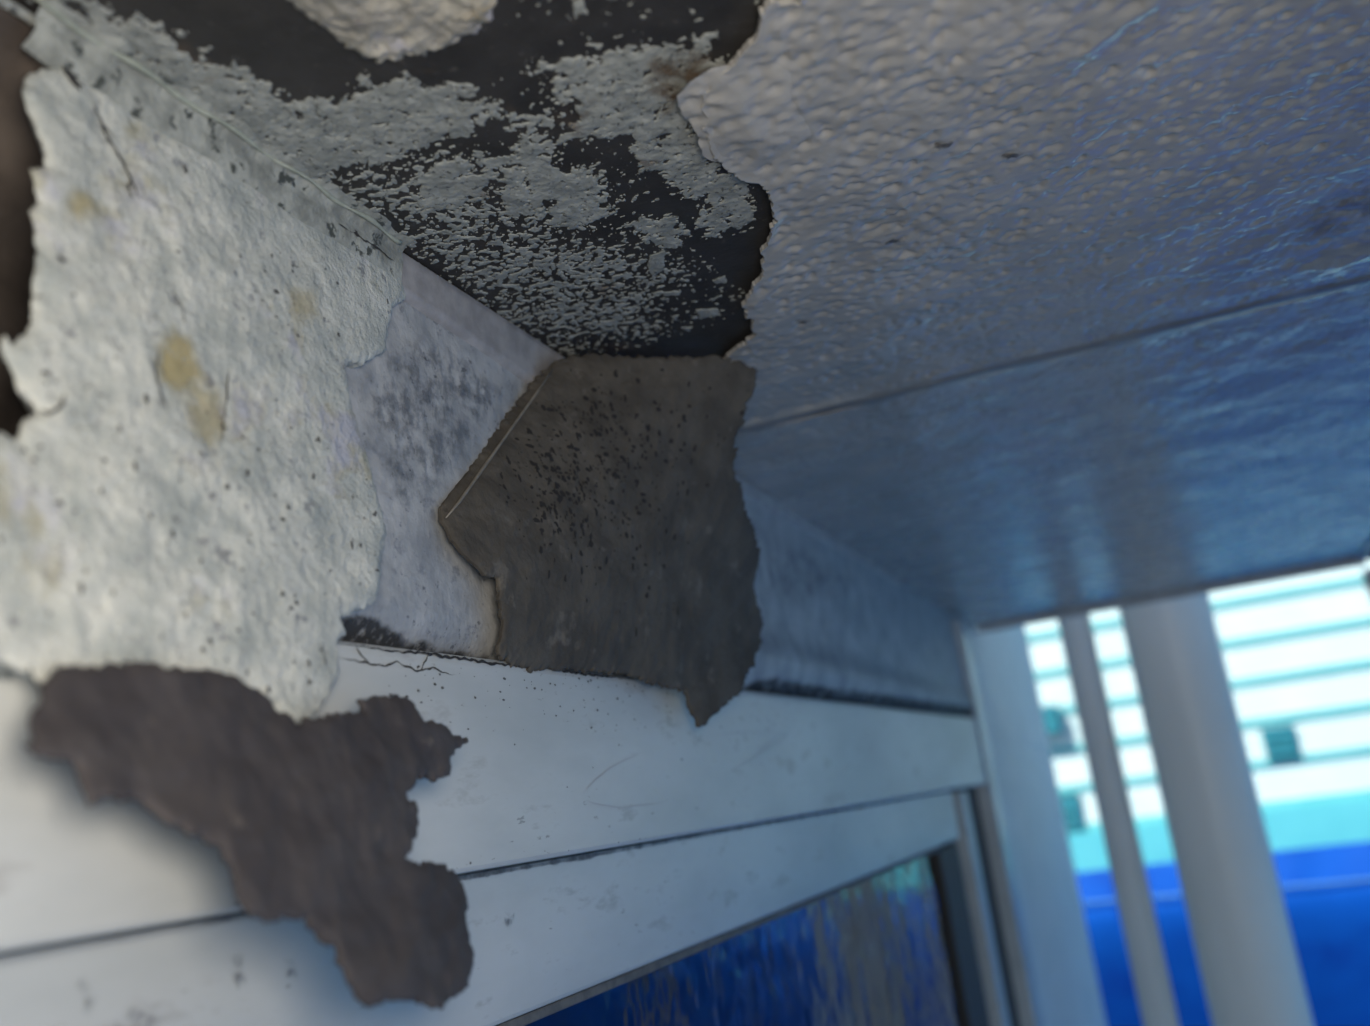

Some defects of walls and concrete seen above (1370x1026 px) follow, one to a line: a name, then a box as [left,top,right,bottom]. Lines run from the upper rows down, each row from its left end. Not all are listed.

spalling [0,0,774,1010]